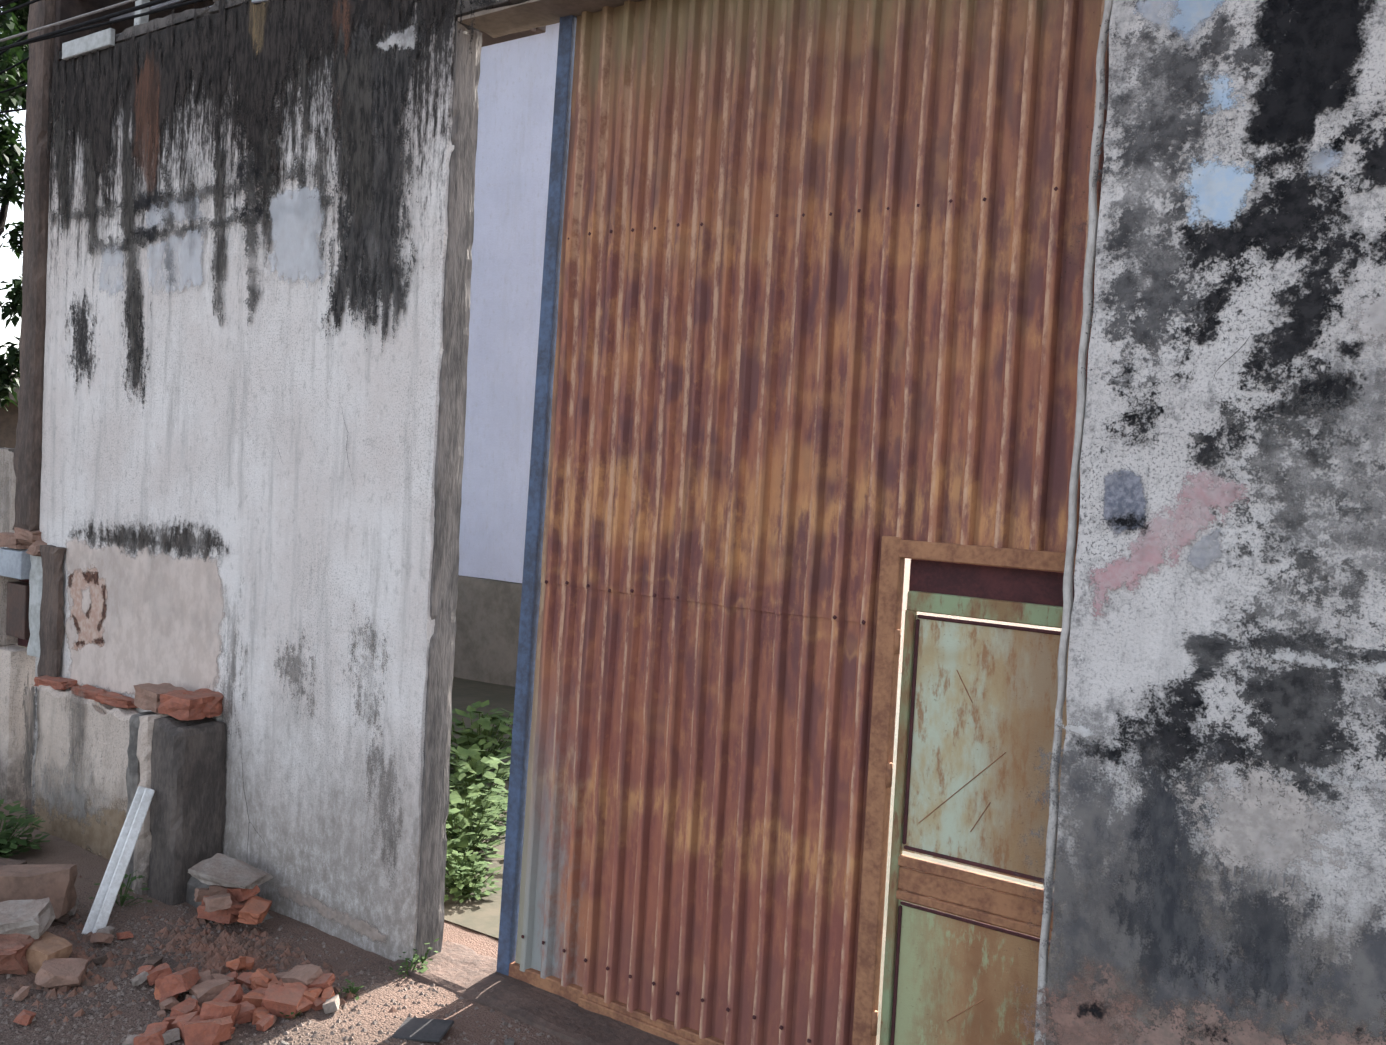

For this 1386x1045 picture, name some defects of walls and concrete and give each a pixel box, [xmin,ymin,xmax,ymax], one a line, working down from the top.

damp [47,0,494,413]
flaking render [68,564,107,651]
damp [68,516,229,561]
peeling [1088,469,1248,620]
damp [1023,0,1386,1045]